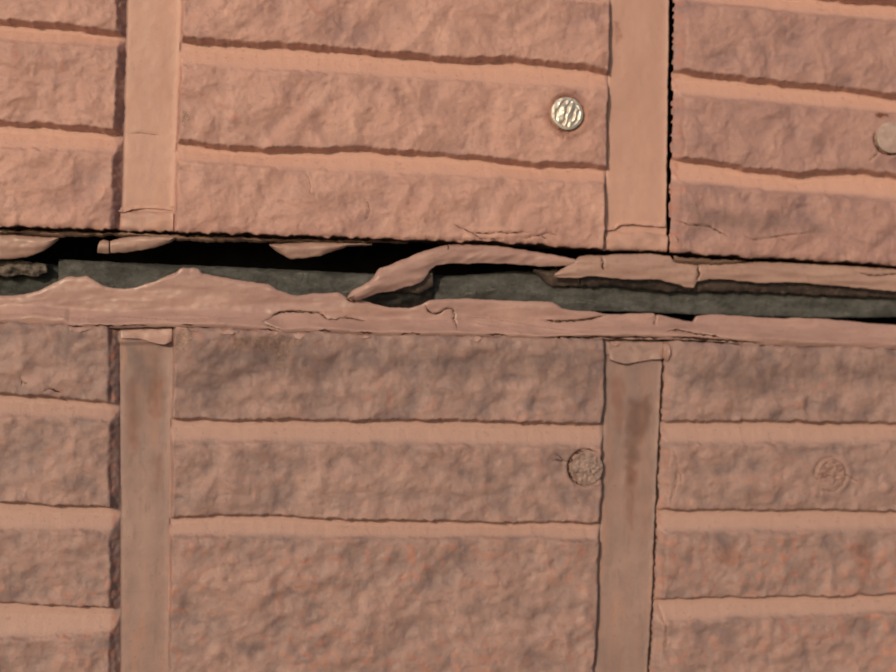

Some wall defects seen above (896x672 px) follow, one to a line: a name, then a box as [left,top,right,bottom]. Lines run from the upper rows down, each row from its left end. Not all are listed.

peeling [120,327,198,344]